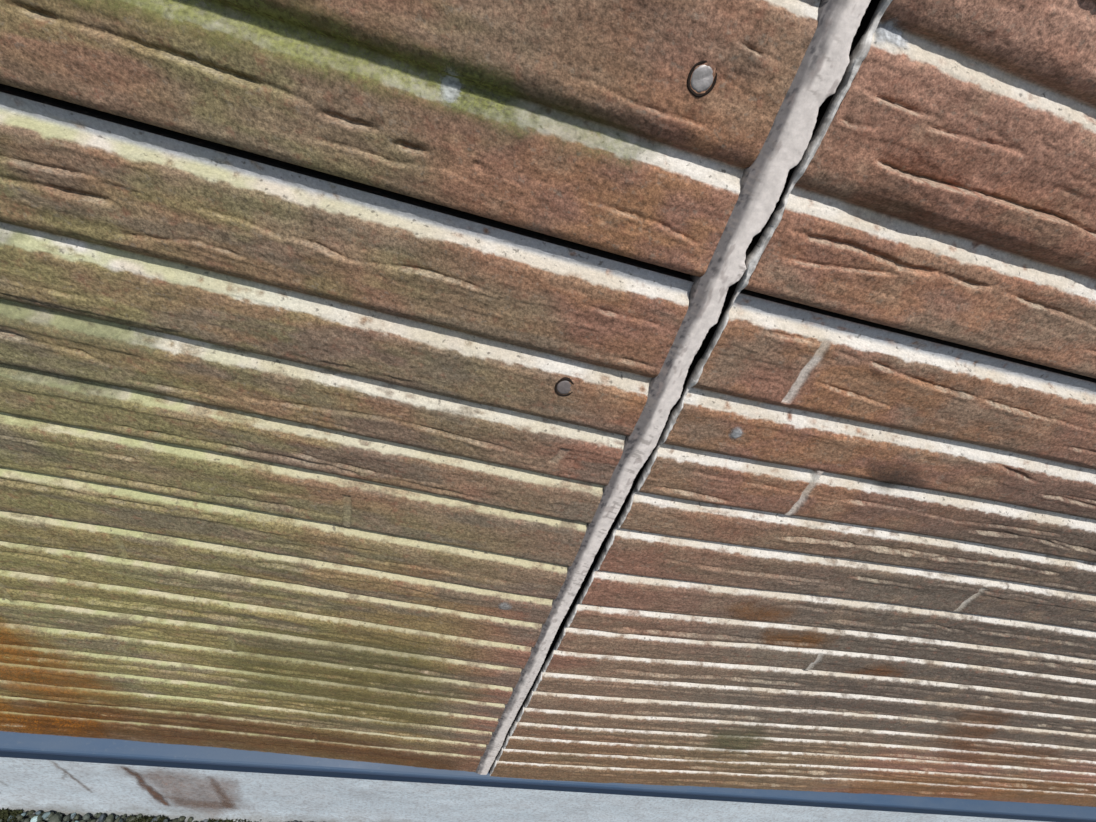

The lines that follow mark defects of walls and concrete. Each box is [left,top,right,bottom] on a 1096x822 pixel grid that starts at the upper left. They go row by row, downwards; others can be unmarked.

crack [489,0,892,776]
rust [0,629,103,698]
rust [0,706,124,734]